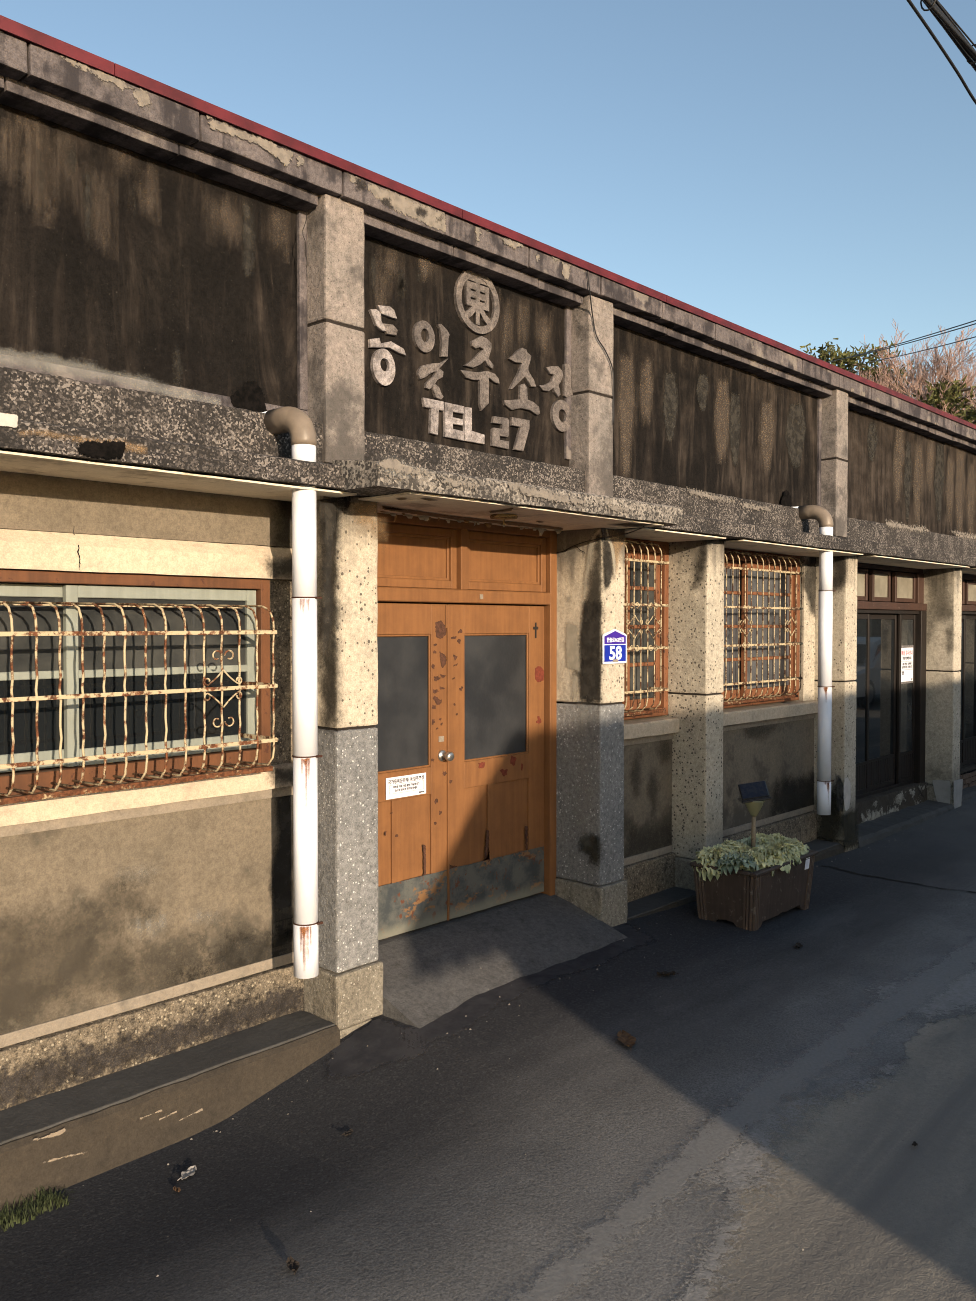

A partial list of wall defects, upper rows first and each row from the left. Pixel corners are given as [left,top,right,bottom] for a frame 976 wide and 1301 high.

water stain [566,528,616,704]
water stain [189,795,294,981]
peeling [861,784,928,824]